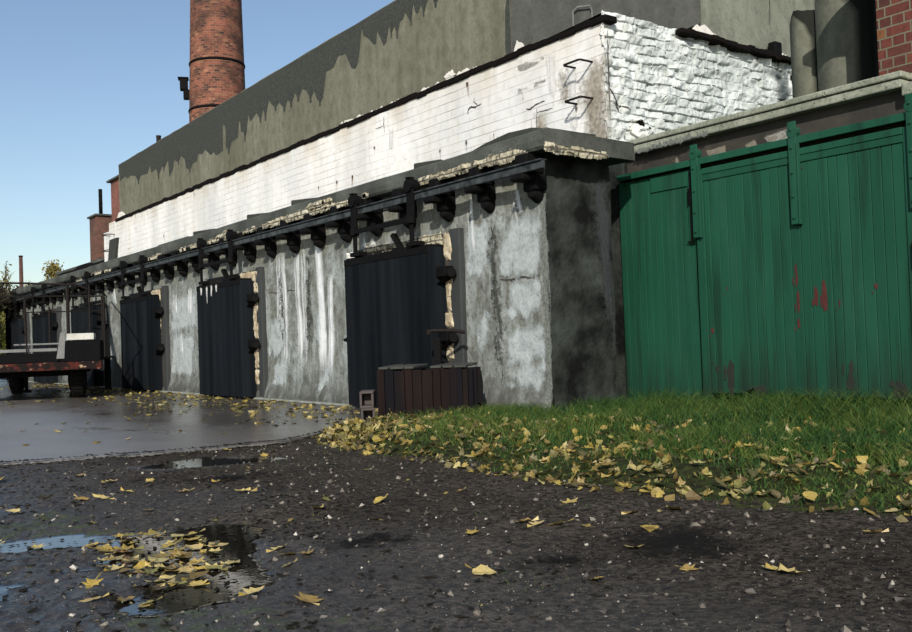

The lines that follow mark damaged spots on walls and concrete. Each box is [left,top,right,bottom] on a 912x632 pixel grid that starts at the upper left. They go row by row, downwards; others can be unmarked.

peeling [421,66,477,91]
spalling [418,149,528,185]
spalling [544,140,609,160]
damp [277,247,335,369]
damp [486,221,507,379]